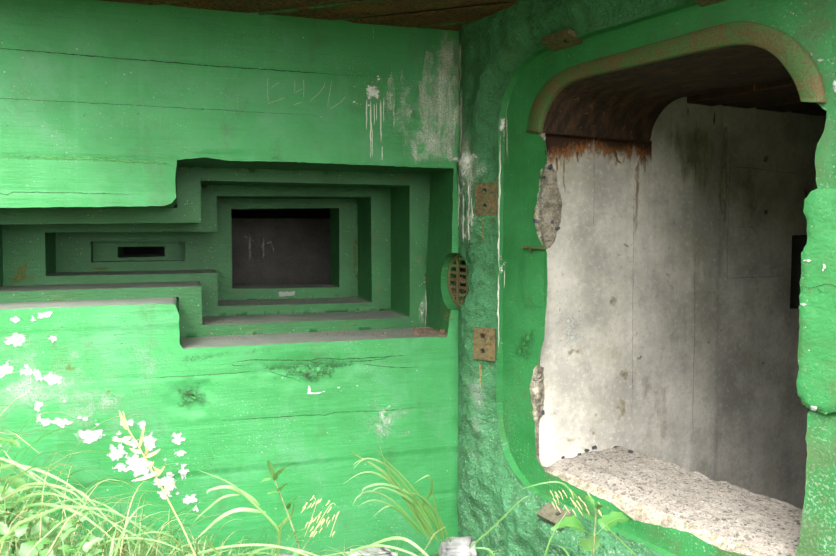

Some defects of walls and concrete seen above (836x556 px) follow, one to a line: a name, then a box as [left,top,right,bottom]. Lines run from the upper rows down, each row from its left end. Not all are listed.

damp [412,44,484,243]
corrosion [545,133,652,171]
spalling [533,164,562,248]
peeling [4,333,26,347]
peeling [0,360,199,512]
spalling [178,388,205,406]
spalling [530,360,769,556]